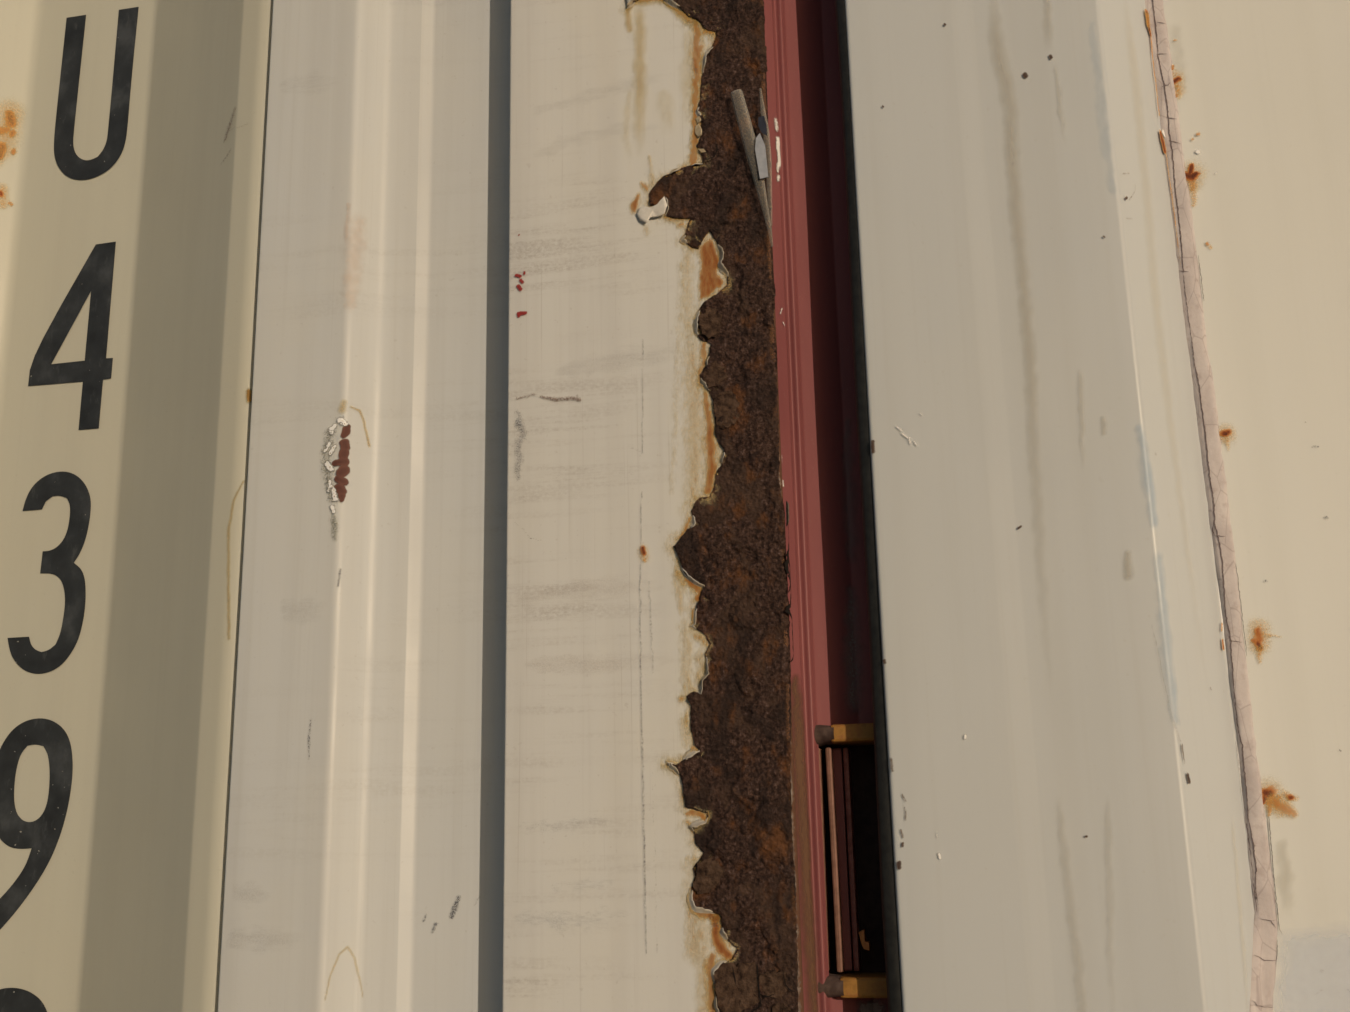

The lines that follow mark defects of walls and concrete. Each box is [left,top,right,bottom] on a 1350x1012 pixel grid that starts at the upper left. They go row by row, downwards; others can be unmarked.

corrosion [1145,9,1160,115]
corrosion [0,110,16,160]
corrosion [1159,131,1201,242]
peeling [323,417,351,514]
corrosion [626,0,804,1012]
corrosion [1251,624,1270,657]
corrosion [1262,785,1297,817]